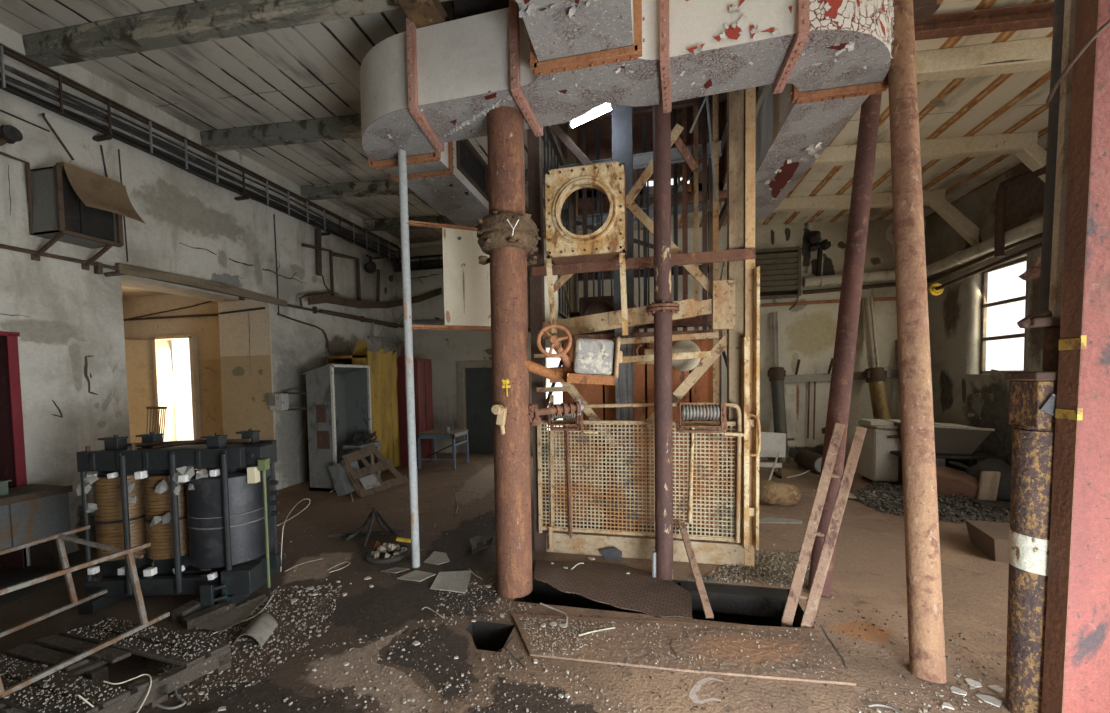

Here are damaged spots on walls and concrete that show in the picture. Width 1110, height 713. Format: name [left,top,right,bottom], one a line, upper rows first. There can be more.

peeling [515,0,594,22]
peeling [687,0,781,55]
peeling [802,41,870,69]
peeling [824,0,894,58]
peeling [765,142,822,202]